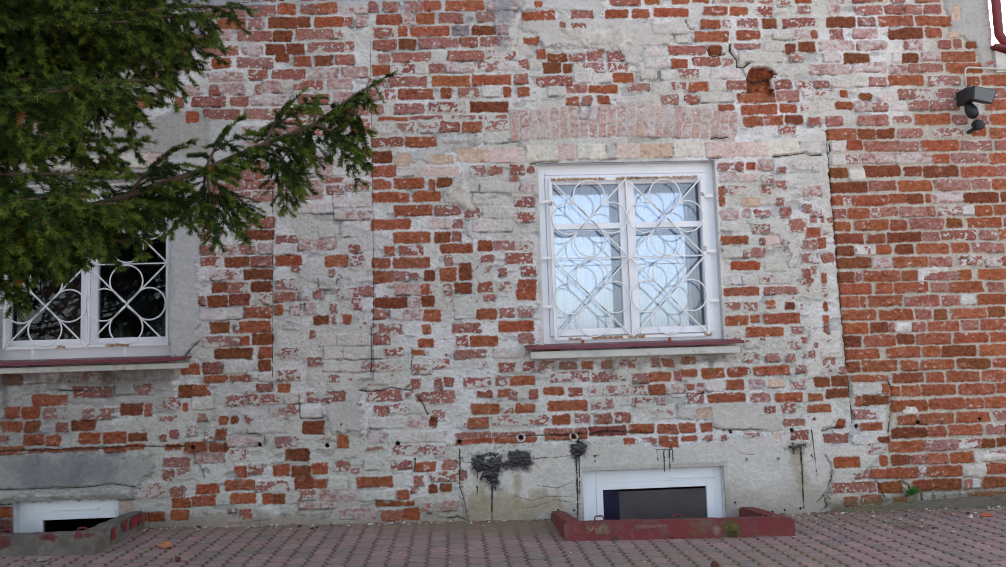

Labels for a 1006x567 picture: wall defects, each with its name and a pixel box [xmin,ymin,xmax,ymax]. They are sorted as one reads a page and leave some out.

crack [685,21,750,96]
spalling [746,67,778,96]
crack [773,132,852,431]